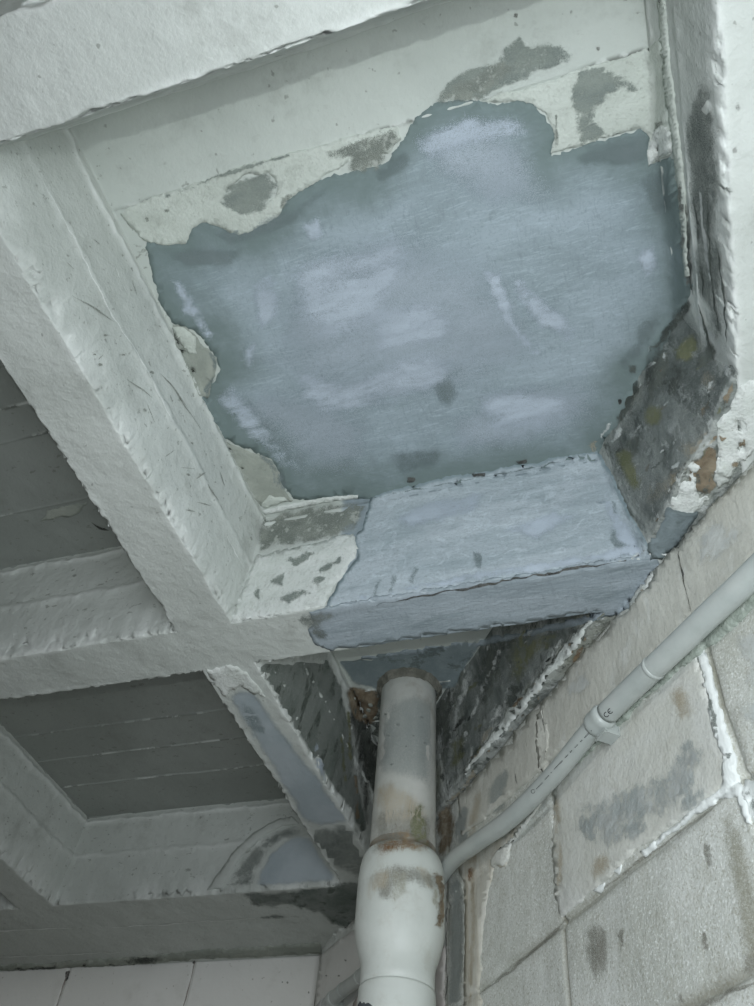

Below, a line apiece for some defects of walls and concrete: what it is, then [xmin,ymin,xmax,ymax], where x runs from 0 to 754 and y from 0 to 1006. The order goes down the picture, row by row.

peeling [172,325,218,398]
peeling [120,126,401,246]
peeling [438,0,692,285]
leakage [590,73,733,525]
leakage [299,610,334,640]
peeling [448,380,754,843]
leakage [233,622,584,927]
peeling [458,803,542,1006]
leakage [582,921,625,980]
peeling [552,650,754,918]